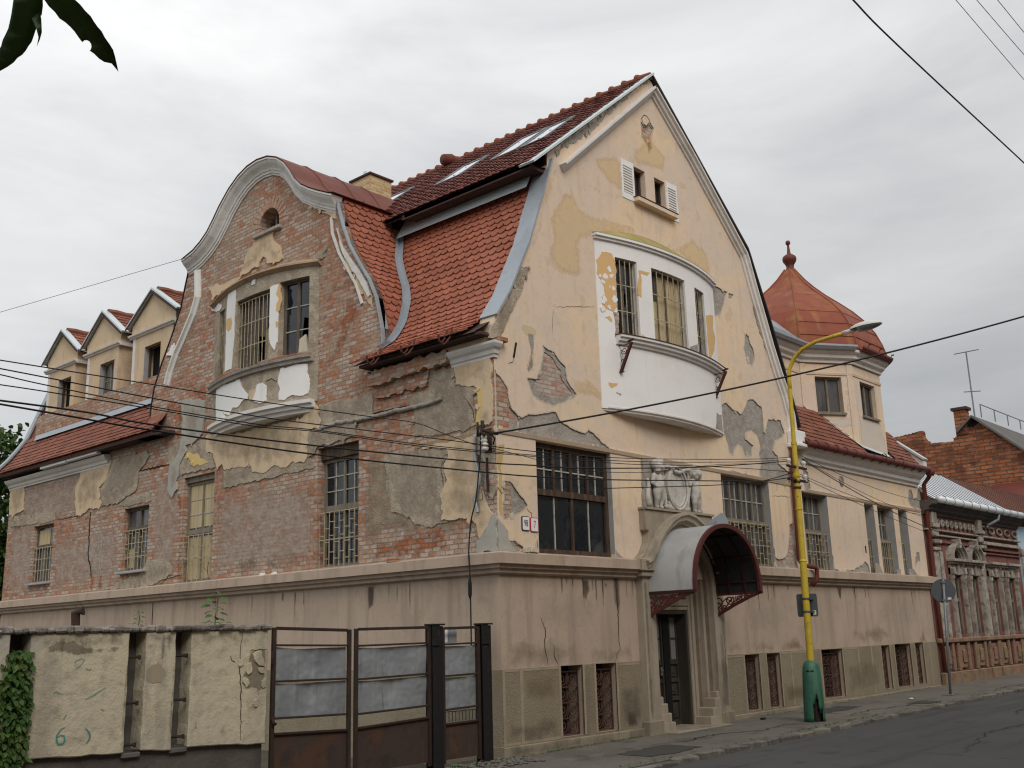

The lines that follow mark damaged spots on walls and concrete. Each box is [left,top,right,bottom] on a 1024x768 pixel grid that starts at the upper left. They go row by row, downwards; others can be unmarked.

peeling [596,252,619,337]
flaking render [743,306,766,367]
flaking render [476,325,621,520]
flaking render [716,398,811,490]
spalling [375,510,445,556]
flaking render [509,538,539,552]
crack [231,638,266,740]